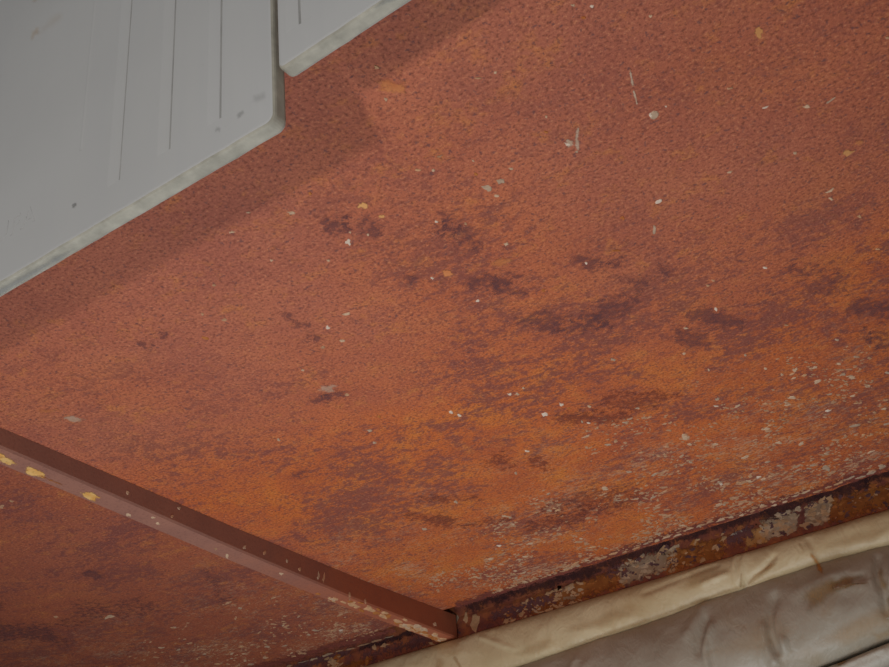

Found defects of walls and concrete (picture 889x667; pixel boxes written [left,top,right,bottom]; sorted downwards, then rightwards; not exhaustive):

corrosion [26,467,61,485]
peeling [429,339,889,594]
corrosion [455,461,889,622]
peeling [503,582,583,624]
corrosion [246,627,432,667]